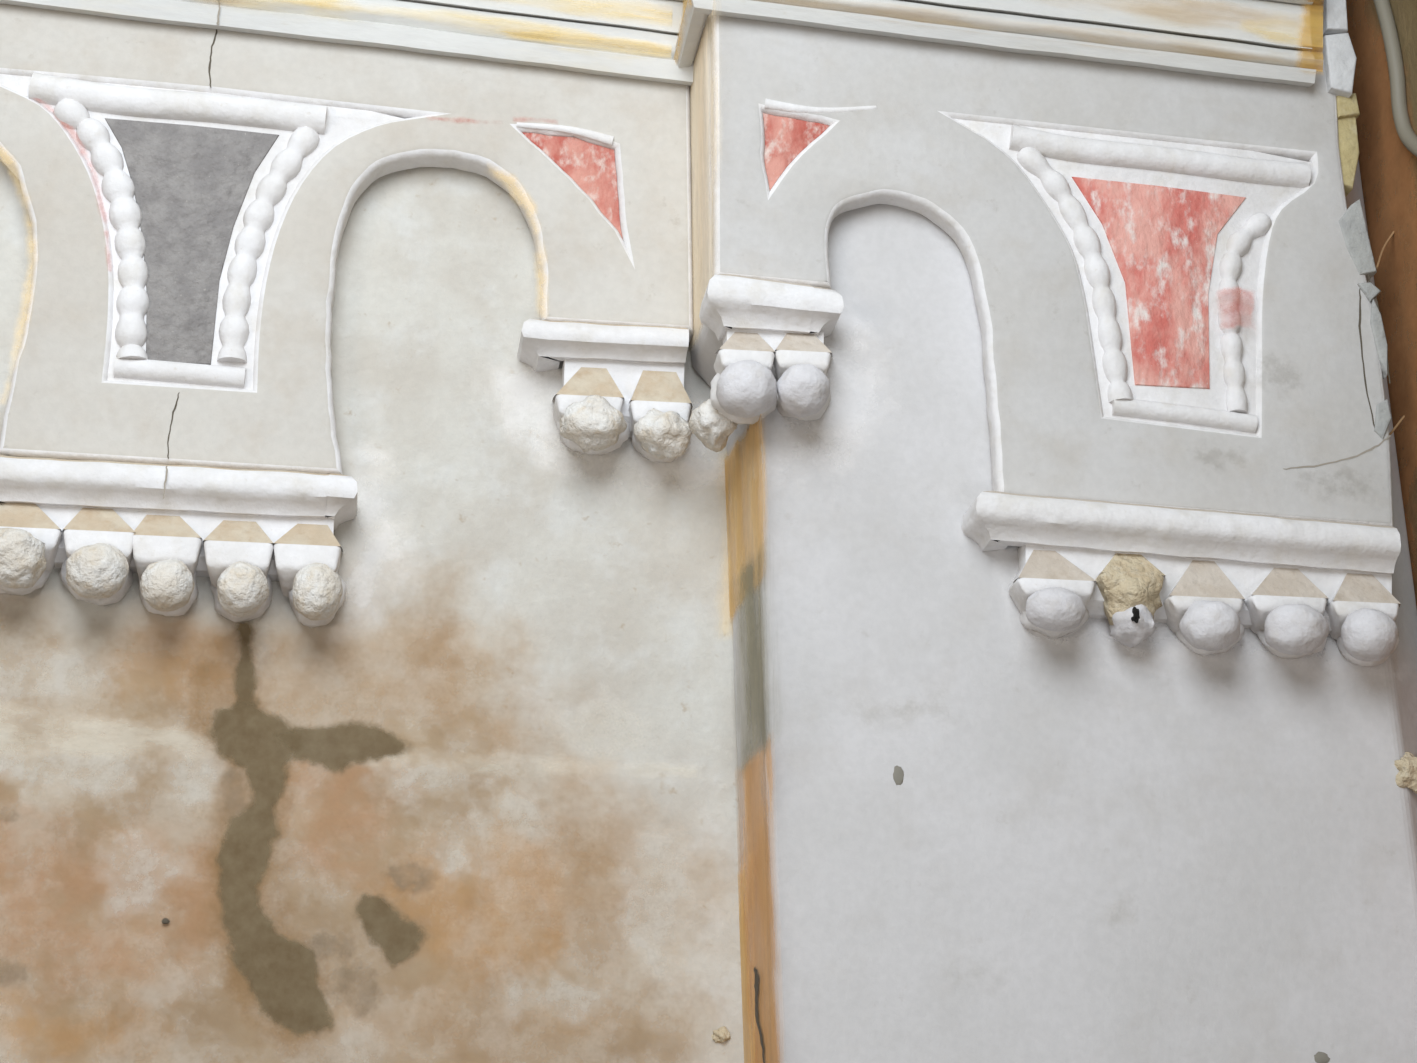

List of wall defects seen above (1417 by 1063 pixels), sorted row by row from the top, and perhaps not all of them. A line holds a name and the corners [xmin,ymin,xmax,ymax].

crack [208,0,220,88]
crack [163,392,180,499]
spalling [1103,571,1163,647]
leakage [0,622,686,1063]